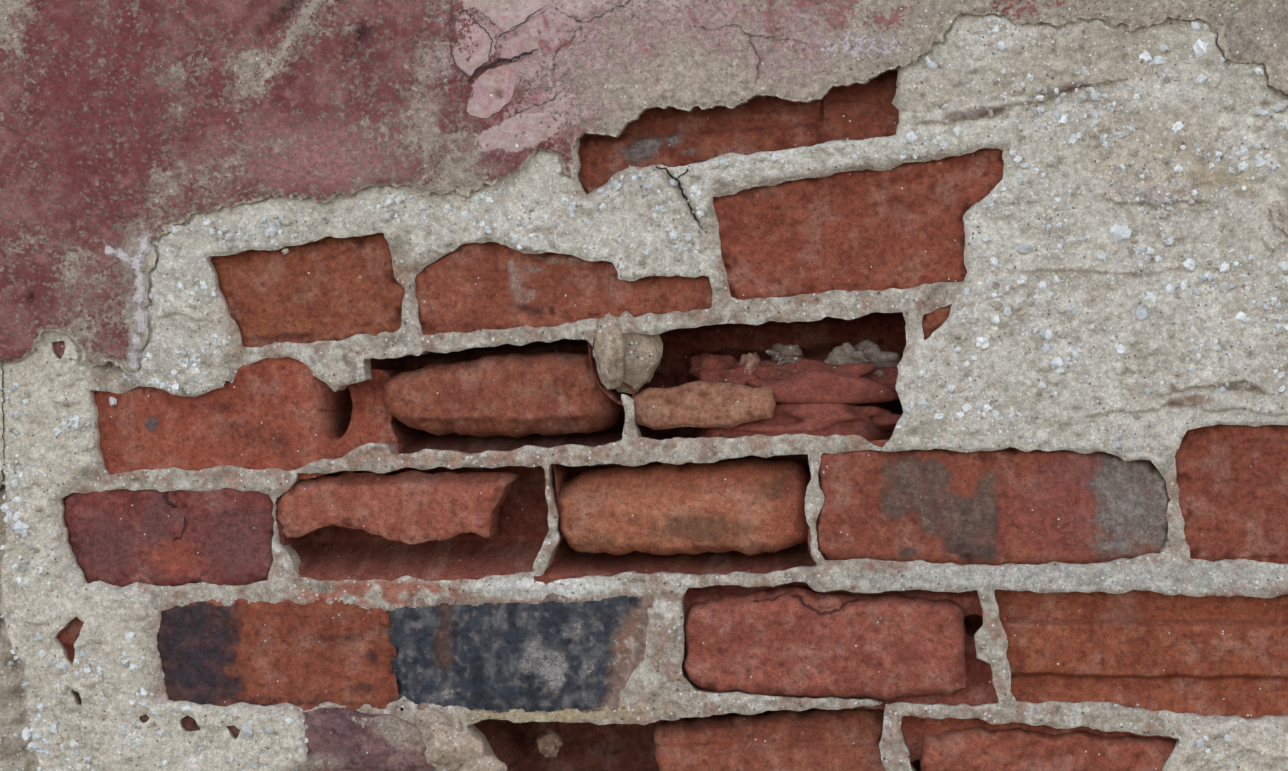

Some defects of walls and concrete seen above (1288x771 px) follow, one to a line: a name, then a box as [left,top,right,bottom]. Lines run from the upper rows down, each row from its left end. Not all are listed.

crack [689,23,812,84]
peeling [433,105,462,135]
spalling [400,422,625,454]
spalling [720,454,810,471]
spalling [293,463,1288,771]